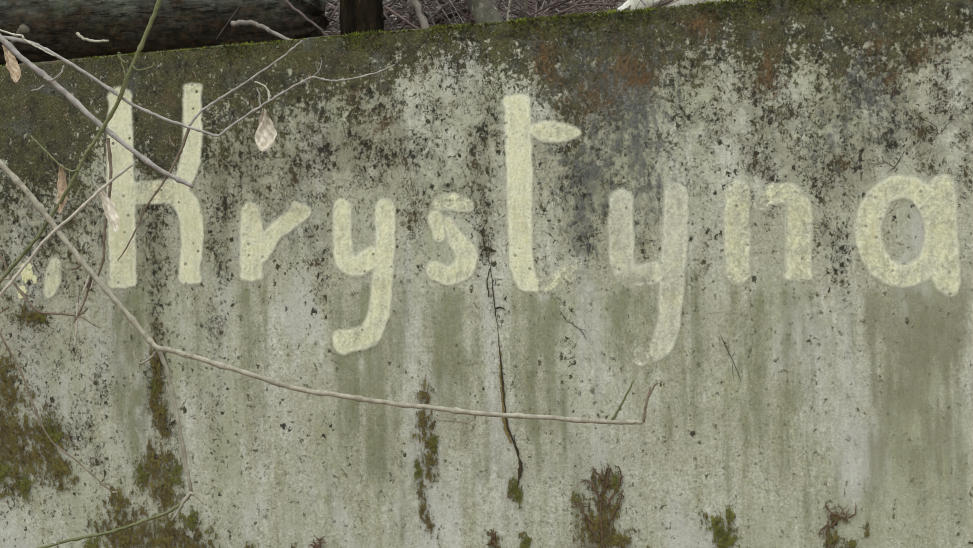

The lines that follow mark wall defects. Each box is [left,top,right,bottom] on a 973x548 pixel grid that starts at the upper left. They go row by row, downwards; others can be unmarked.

water stain [558,40,675,255]
water stain [336,342,385,470]
water stain [356,287,371,338]
crack [483,237,523,487]